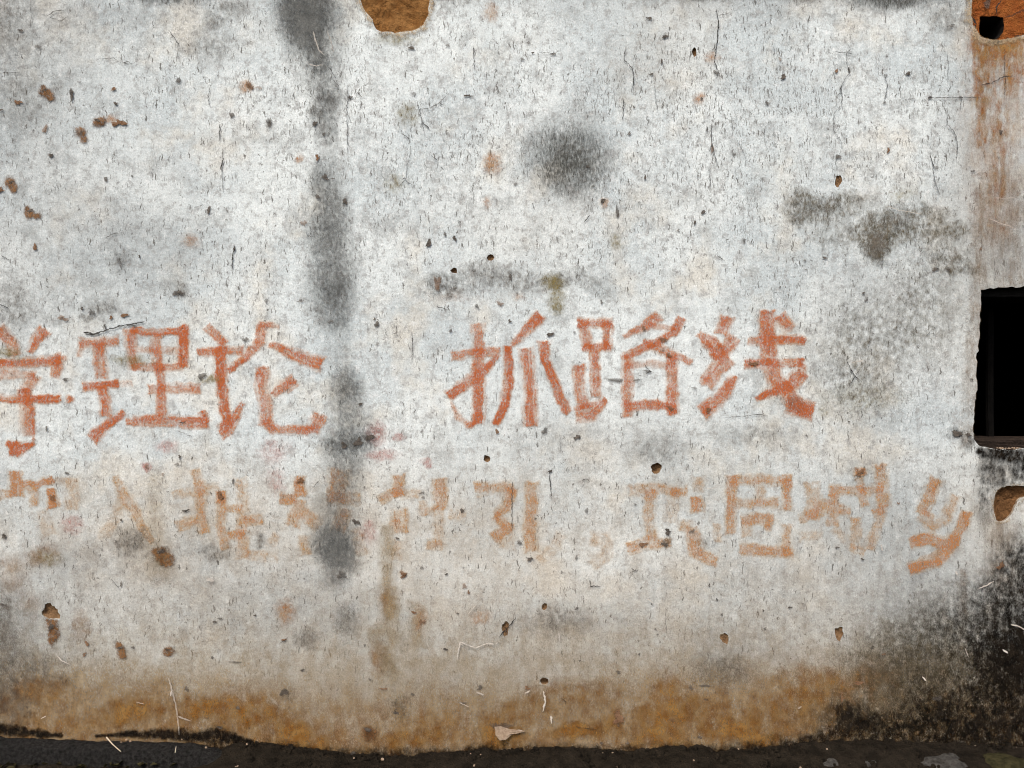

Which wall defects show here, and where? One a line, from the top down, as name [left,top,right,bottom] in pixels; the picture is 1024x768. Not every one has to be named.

spalling [359,0,434,49]
spalling [951,0,1024,45]
leakage [282,0,337,141]
rust [972,35,1024,140]
leakage [312,171,350,327]
leakage [787,191,977,273]
leakage [315,378,368,581]
leakage [956,430,1024,500]
spalling [992,485,1024,524]
spalling [42,603,60,646]
leakage [0,528,1024,757]